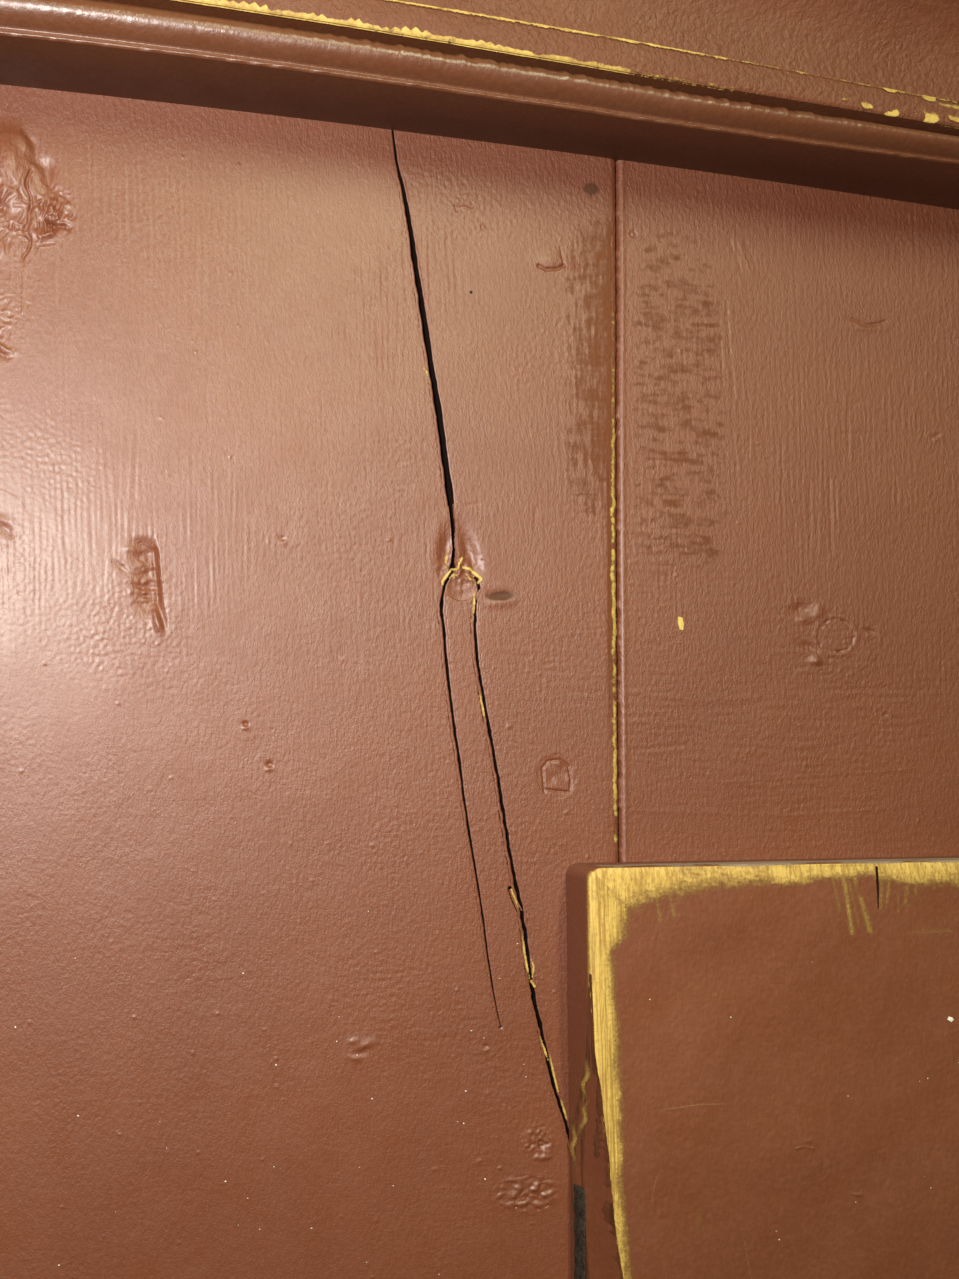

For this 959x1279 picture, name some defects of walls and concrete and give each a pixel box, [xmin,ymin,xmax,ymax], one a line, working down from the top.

peeling [386,0,814,75]
peeling [830,77,959,128]
crack [389,130,569,1148]